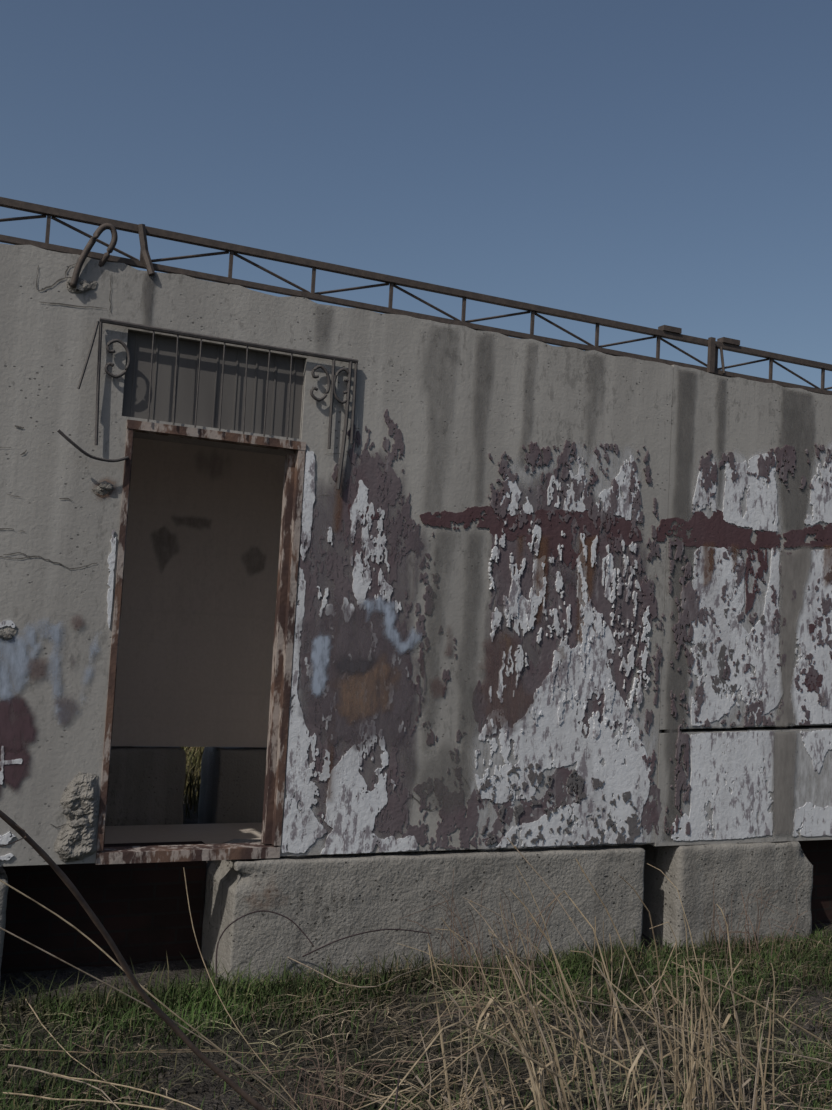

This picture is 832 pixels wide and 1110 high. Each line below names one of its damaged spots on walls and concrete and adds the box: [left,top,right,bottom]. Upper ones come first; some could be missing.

crack [0,528,97,569]
leakage [471,370,832,848]
spalling [0,620,17,640]
peeling [281,409,832,854]
peeling [0,746,23,785]
spalling [54,772,99,863]
peeling [0,831,16,861]